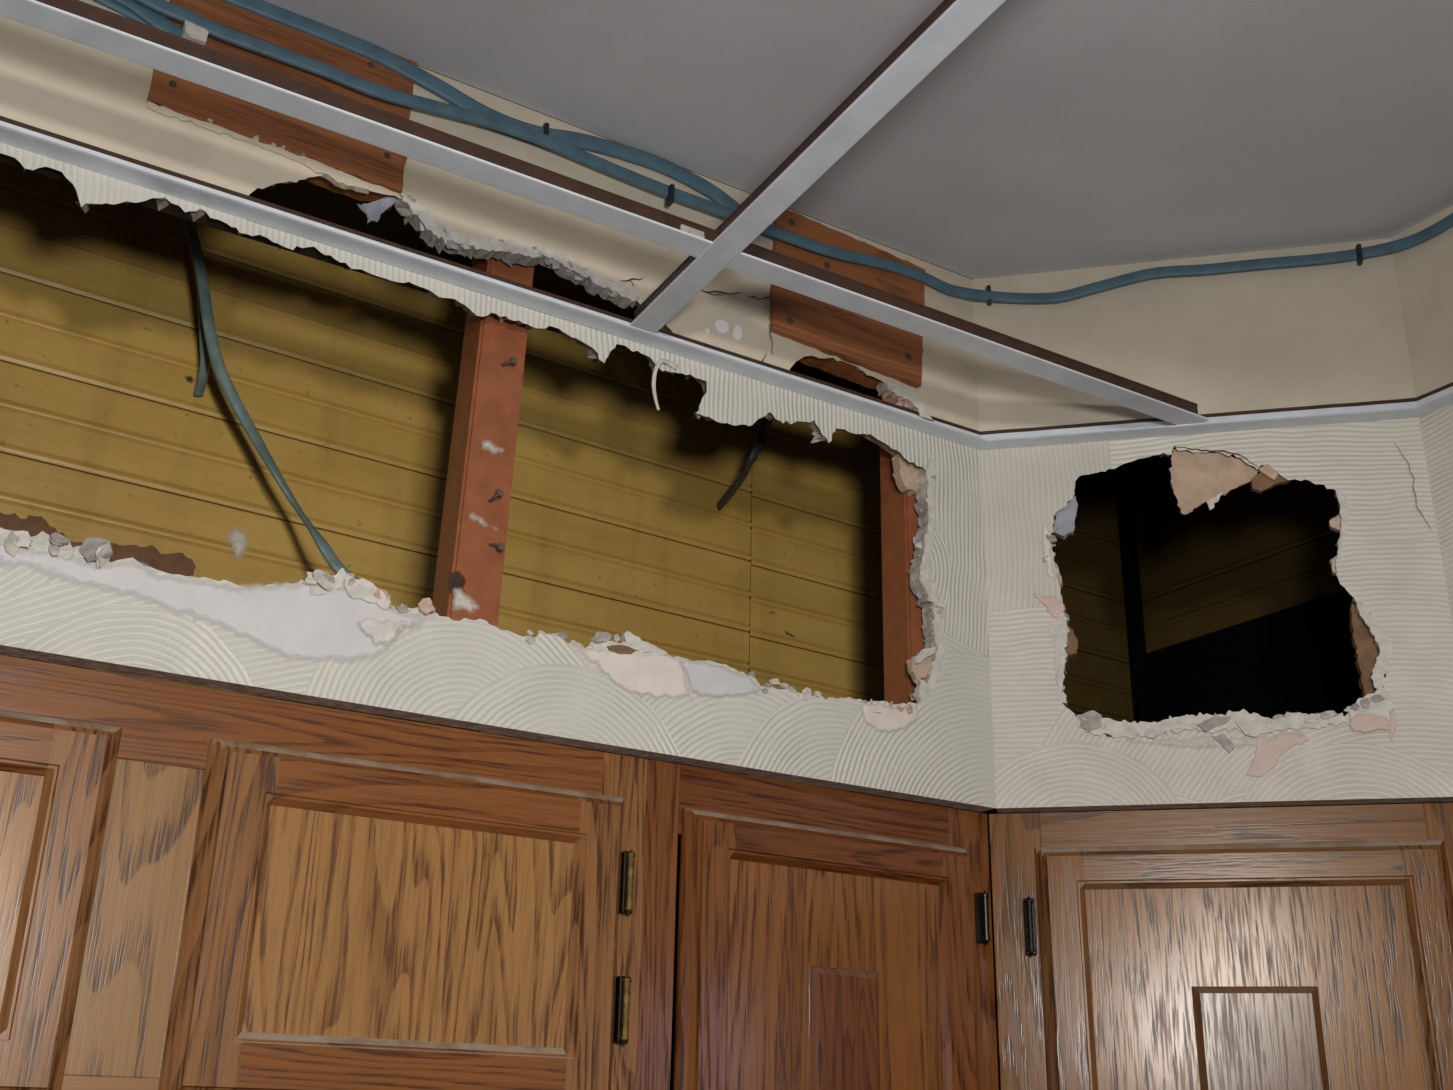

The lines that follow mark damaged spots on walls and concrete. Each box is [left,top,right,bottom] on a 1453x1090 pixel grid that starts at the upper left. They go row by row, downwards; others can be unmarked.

flaking render [394,193,640,309]
flaking render [876,381,933,422]
flaking render [0,512,439,661]
flaking render [525,630,822,702]
flaking render [862,455,945,732]
flaking render [1034,496,1395,777]